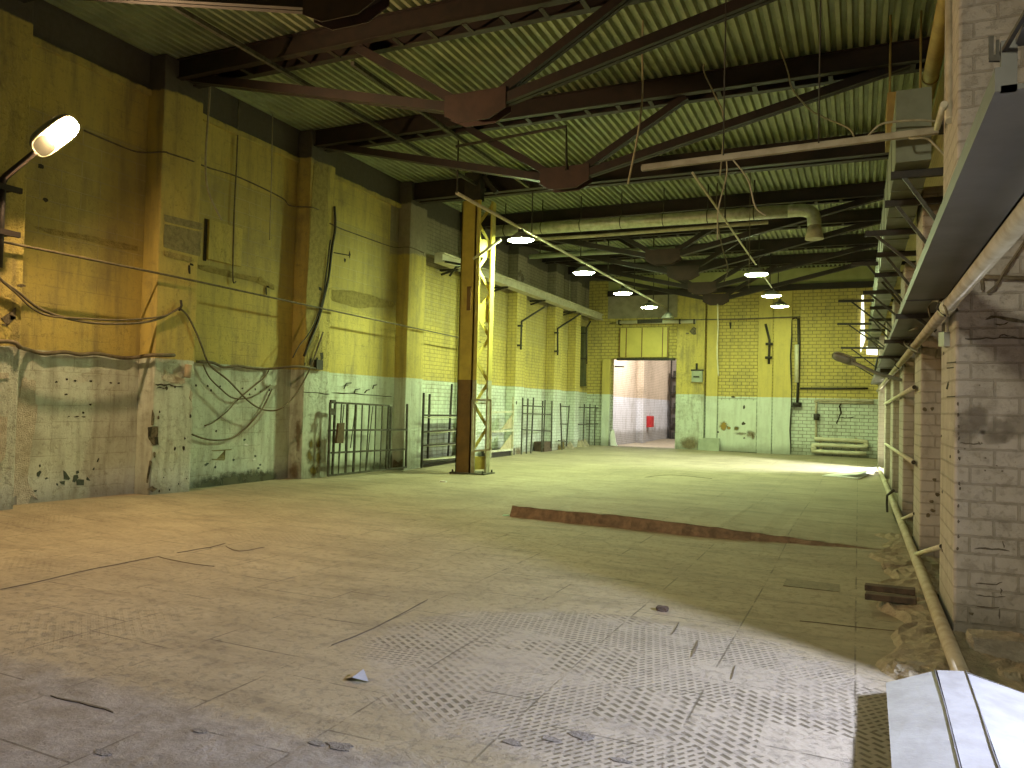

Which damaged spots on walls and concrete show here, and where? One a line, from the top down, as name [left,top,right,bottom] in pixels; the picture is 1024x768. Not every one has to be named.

spalling [0,377,99,505]
leakage [194,471,275,488]
crack [0,543,263,590]